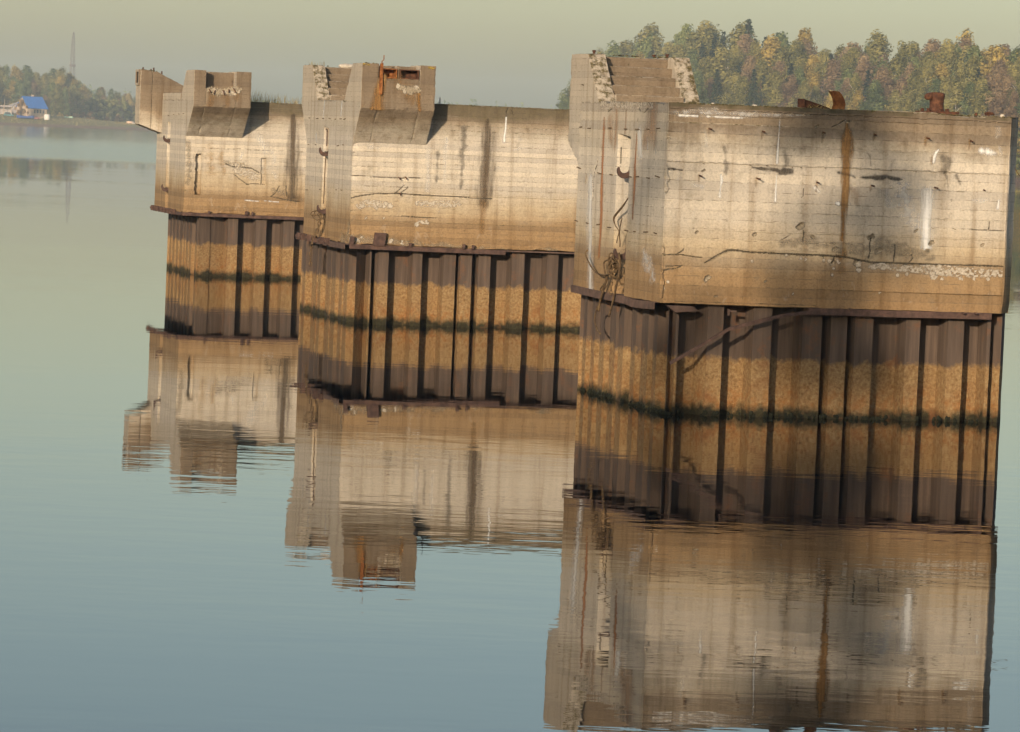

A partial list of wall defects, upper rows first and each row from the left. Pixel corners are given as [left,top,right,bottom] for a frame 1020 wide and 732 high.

rust [838,123,854,258]
water stain [921,188,932,250]
crack [664,230,1004,271]
peeling [853,234,1003,281]